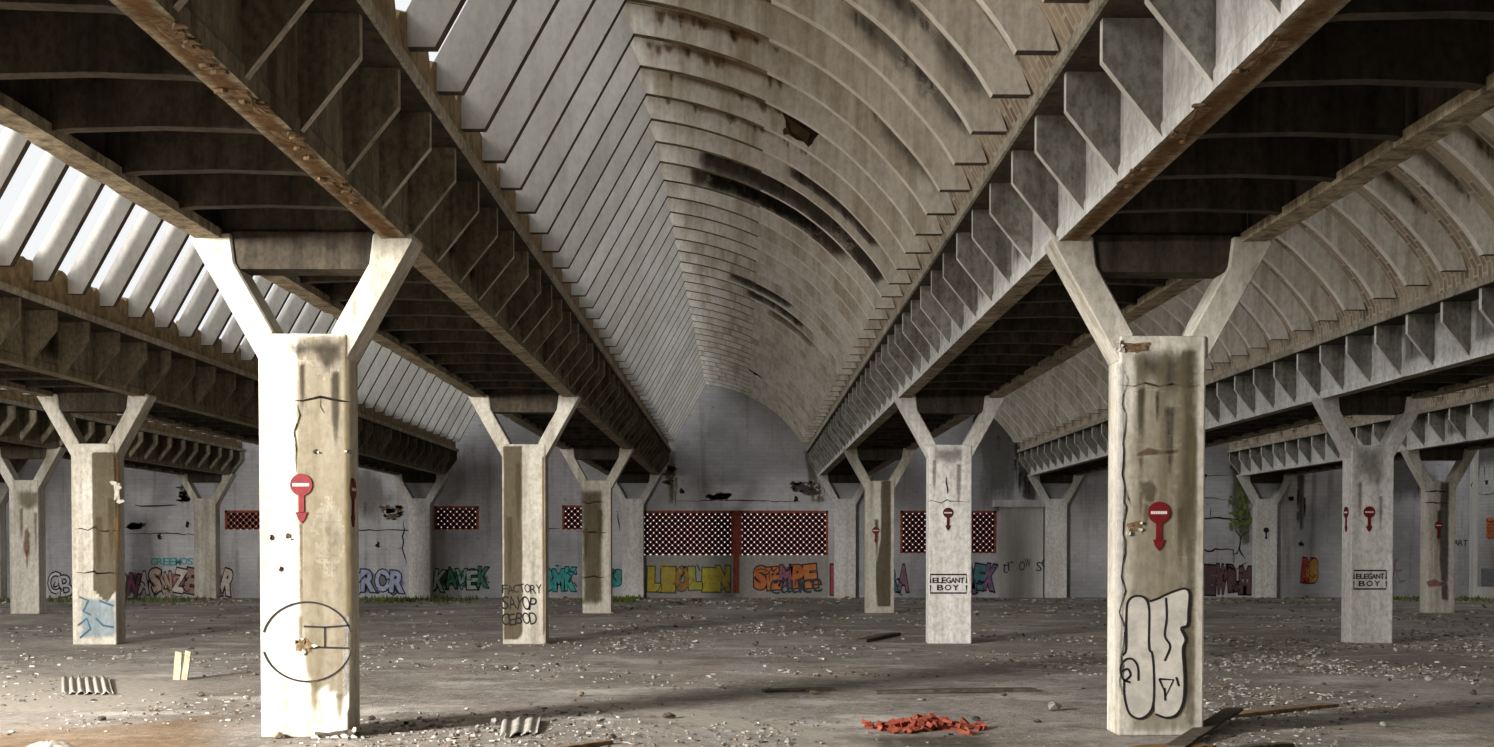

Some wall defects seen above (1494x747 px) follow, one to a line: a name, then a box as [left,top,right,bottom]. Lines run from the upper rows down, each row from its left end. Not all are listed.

spalling [781,111,819,147]
water stain [692,152,883,282]
water stain [731,274,812,344]
water stain [296,336,350,712]